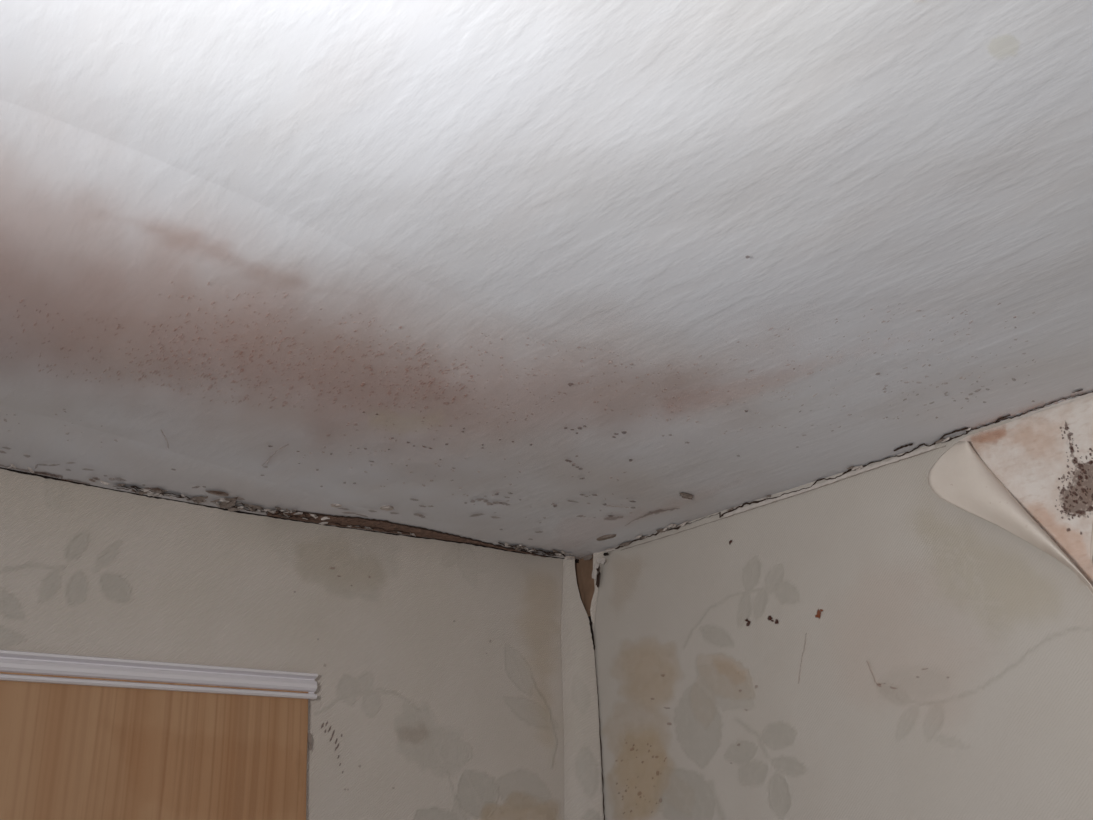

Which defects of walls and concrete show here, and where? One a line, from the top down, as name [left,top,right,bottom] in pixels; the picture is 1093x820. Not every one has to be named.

crack [0,467,565,559]
crack [615,389,1093,549]
flaking render [724,392,1093,595]
crack [594,650,605,820]